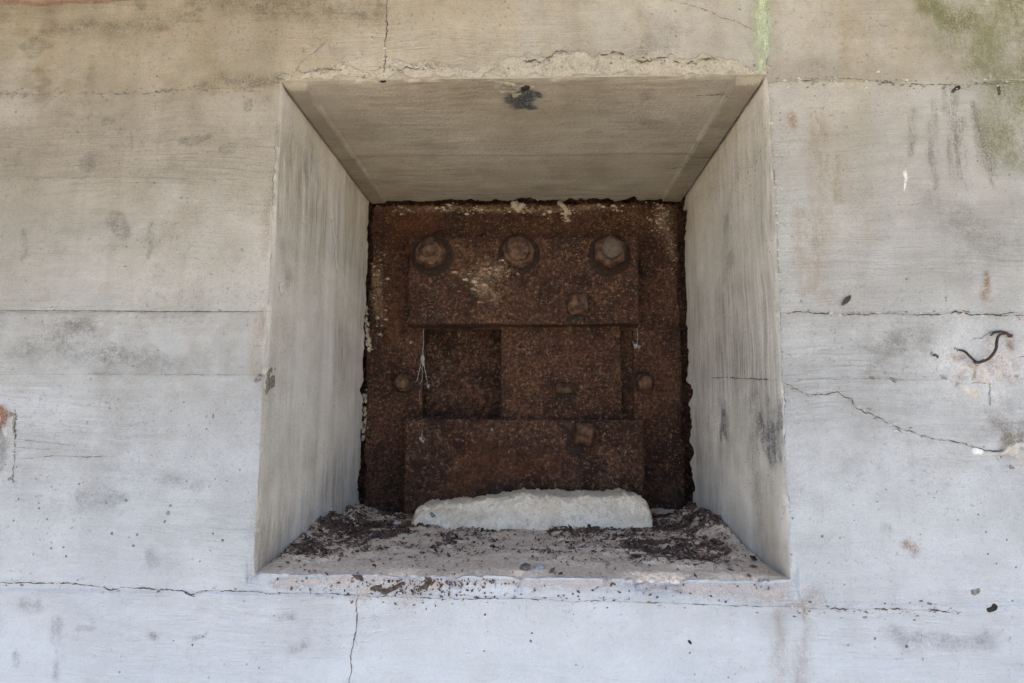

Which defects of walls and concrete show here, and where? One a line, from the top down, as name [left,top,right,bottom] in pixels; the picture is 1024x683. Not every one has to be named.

crack [382,0,436,77]
spalling [85,51,1024,188]
crack [711,377,1002,452]
crack [0,577,962,678]